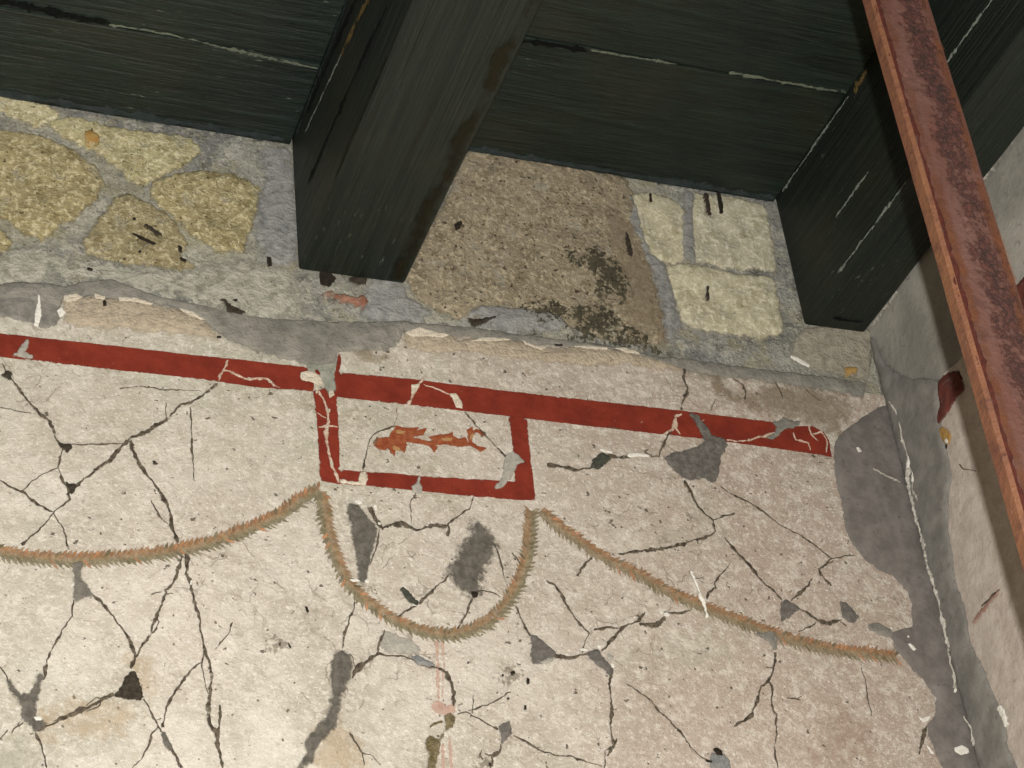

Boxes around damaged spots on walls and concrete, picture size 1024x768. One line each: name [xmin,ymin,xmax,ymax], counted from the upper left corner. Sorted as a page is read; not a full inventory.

peeling [34,295,42,327]
spalling [57,293,222,338]
damp [520,231,662,355]
corrosion [979,182,1024,333]
crack [318,377,506,483]
corrosion [939,427,951,449]
crack [0,360,275,768]
crack [546,480,854,660]
crack [873,402,957,693]
flaking render [114,671,143,700]
crack [342,574,708,768]
peeling [954,745,969,755]